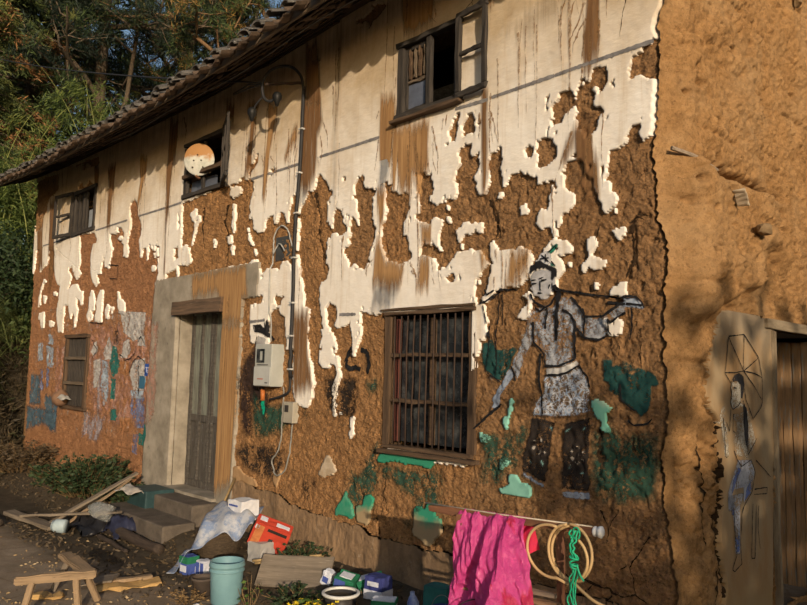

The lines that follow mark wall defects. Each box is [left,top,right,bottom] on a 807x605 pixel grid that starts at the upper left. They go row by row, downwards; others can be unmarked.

crack [314,192,326,261]
flaking render [24,67,679,605]
crack [565,536,651,604]